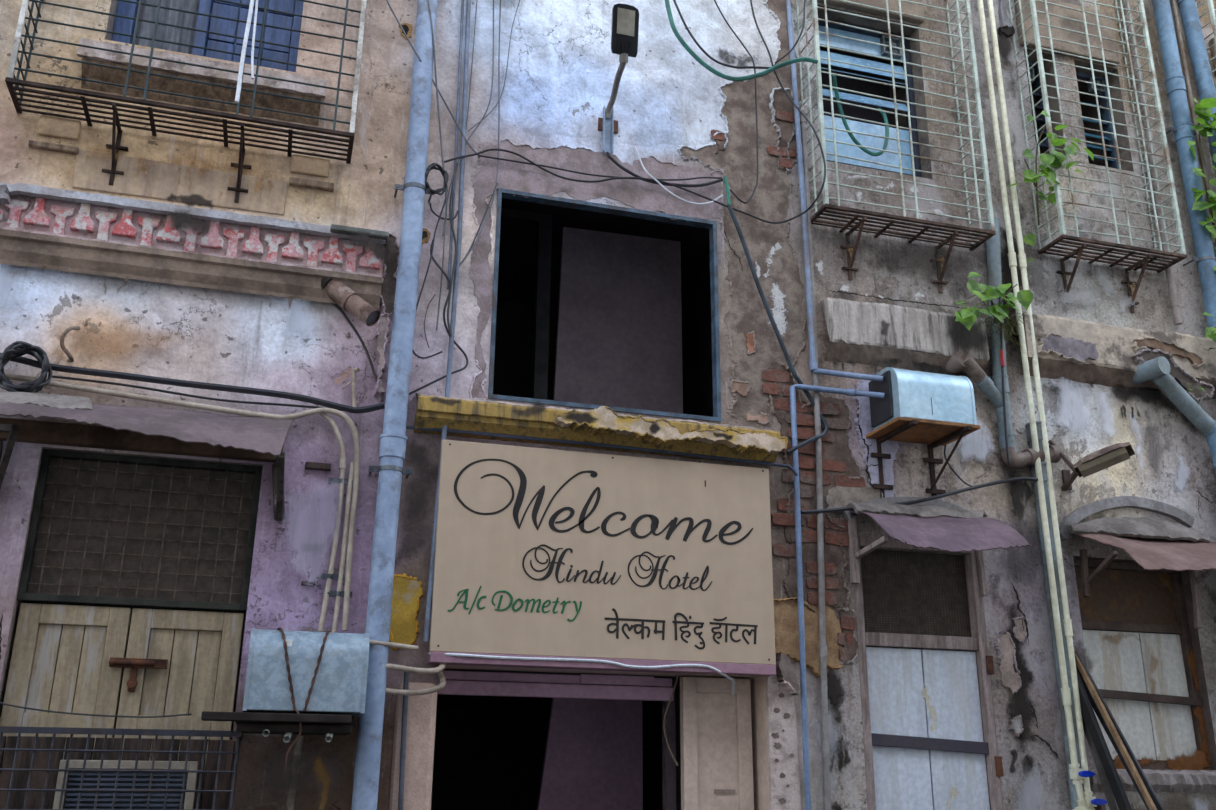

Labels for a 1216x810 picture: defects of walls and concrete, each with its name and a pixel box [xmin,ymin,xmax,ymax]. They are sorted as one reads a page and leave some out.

flaking render [468,0,900,803]
flaking render [1131,337,1215,404]
flaking render [994,616,1027,694]
flaking render [1008,715,1024,739]
corrosion [1114,706,1211,770]